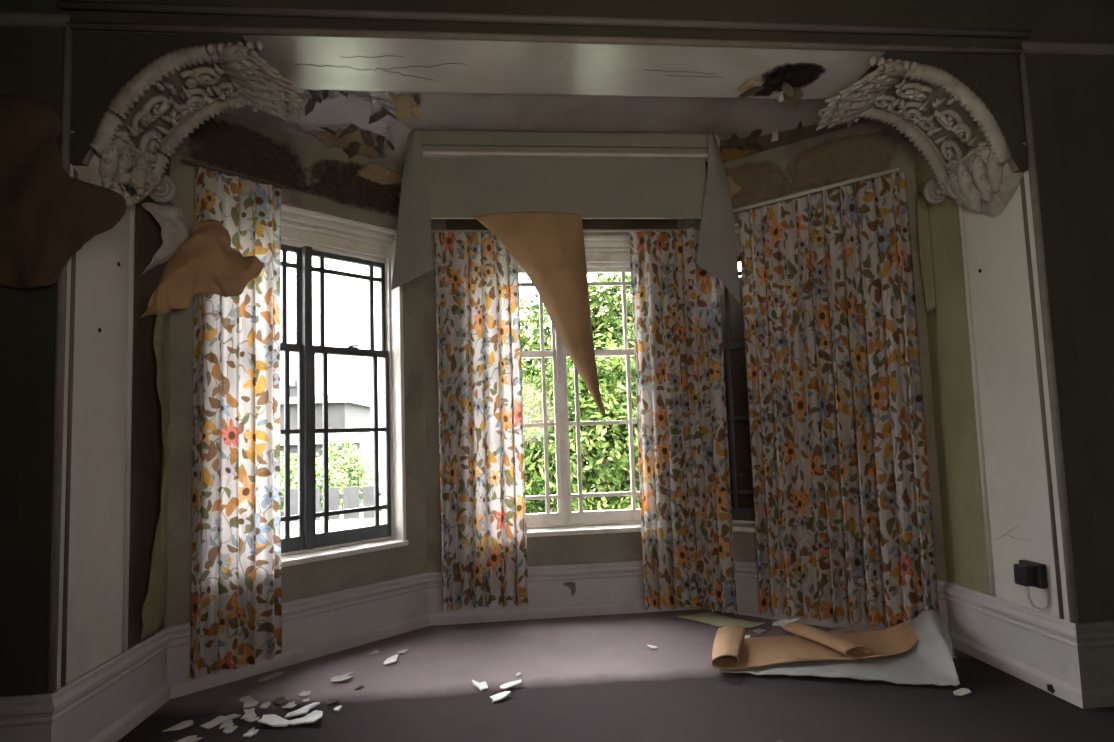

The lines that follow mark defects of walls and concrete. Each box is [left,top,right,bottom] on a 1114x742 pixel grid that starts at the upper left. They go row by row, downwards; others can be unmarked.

crack [293,56,467,80]
peeling [284,90,423,159]
spalling [714,63,874,155]